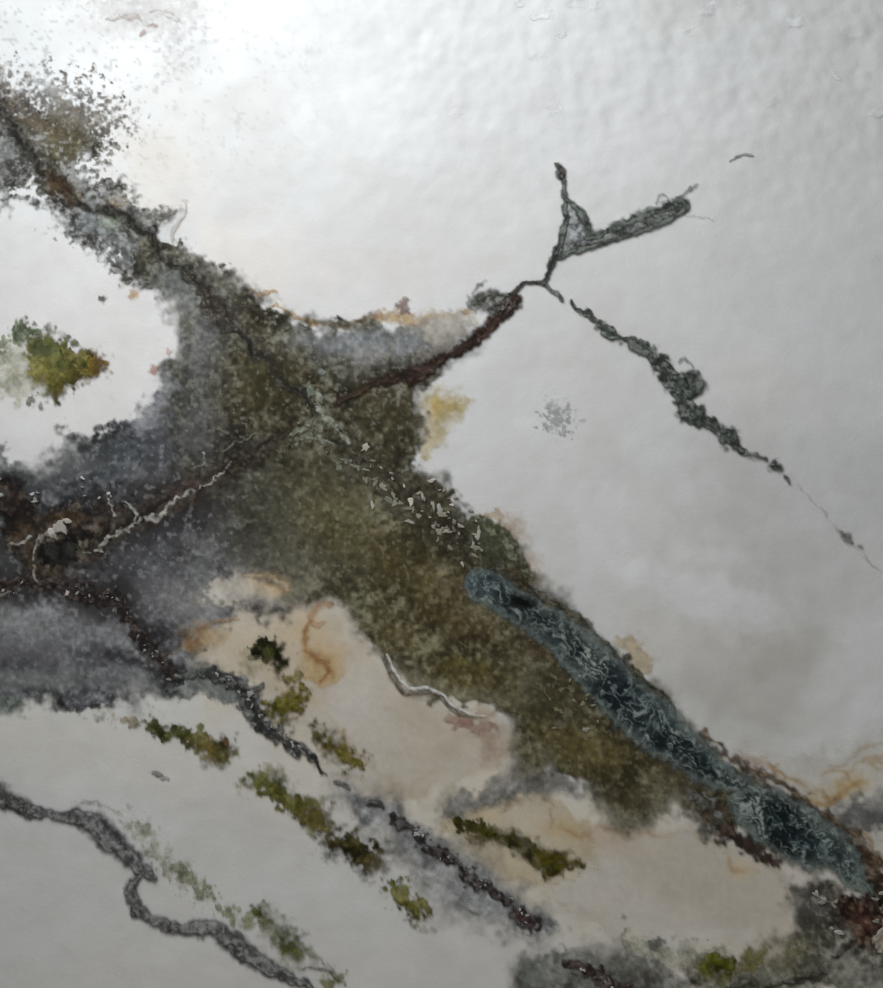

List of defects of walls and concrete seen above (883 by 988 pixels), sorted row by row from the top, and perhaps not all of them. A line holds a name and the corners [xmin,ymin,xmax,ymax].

crack [0,106,790,708]
leakage [0,88,738,941]
crack [841,531,862,548]
crack [0,573,542,933]
crack [534,674,599,732]
leakage [463,515,883,893]
crack [0,783,314,988]
crack [562,959,633,988]
leakage [458,790,883,988]
crack [730,971,827,988]